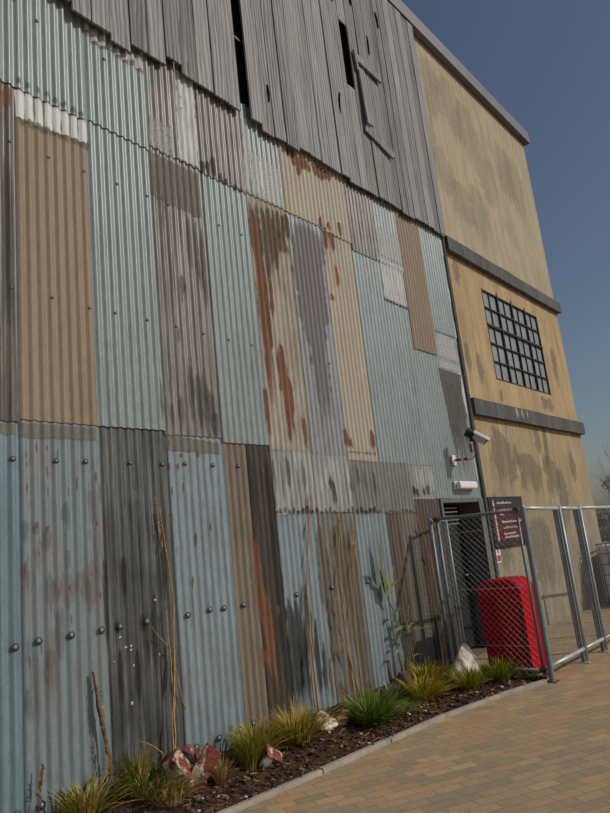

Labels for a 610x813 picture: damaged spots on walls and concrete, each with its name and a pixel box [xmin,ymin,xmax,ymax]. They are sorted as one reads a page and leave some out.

corrosion [286,148,331,182]
corrosion [319,216,342,253]
corrosion [249,202,308,443]
corrosion [252,539,280,688]